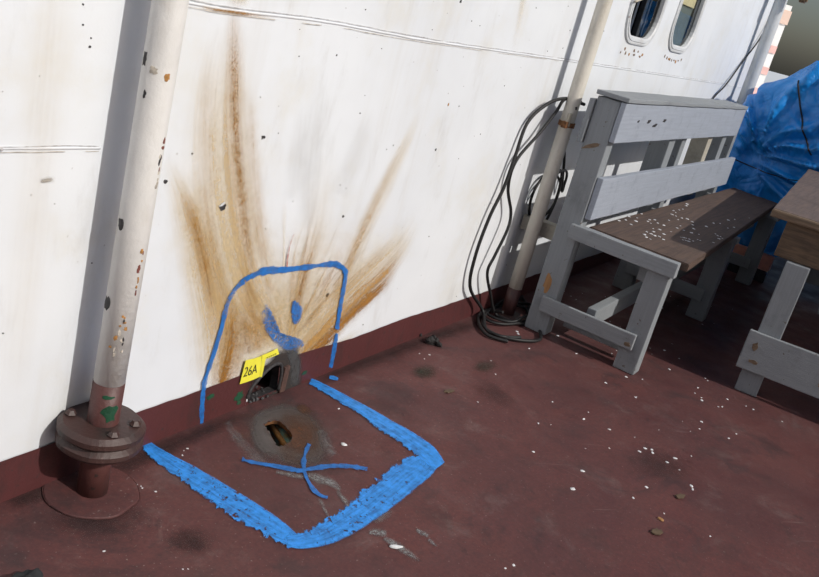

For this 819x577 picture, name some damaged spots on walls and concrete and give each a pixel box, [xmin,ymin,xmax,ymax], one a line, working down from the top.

peeling [109,315,127,357]
corrosion [185,140,275,383]
corrosion [298,261,391,353]
peeling [251,405,339,489]